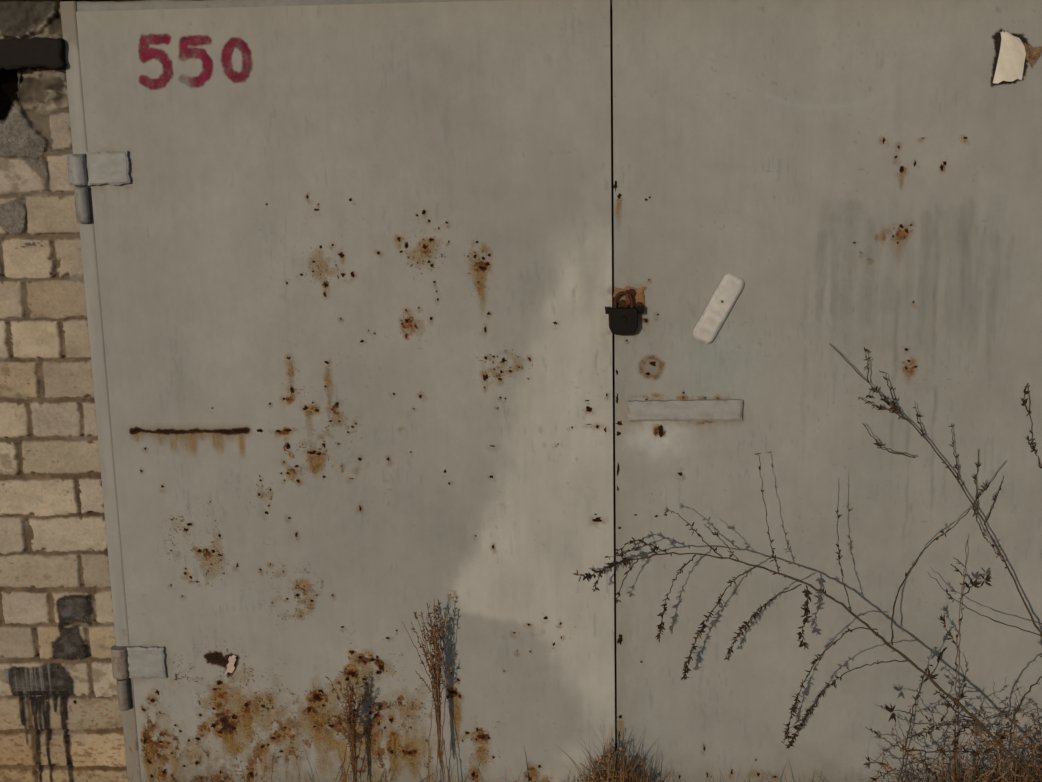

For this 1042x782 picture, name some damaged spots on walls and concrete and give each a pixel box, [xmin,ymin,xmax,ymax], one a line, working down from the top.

corrosion [397,210,450,269]
corrosion [882,224,912,244]
corrosion [300,244,355,297]
corrosion [467,241,491,297]
corrosion [400,307,432,339]
corrosion [478,349,531,388]
corrosion [640,356,664,379]
corrosion [129,357,357,483]
corrosion [278,580,317,619]
peeling [204,651,239,677]
corrosion [140,643,433,782]
corrosion [446,673,495,782]